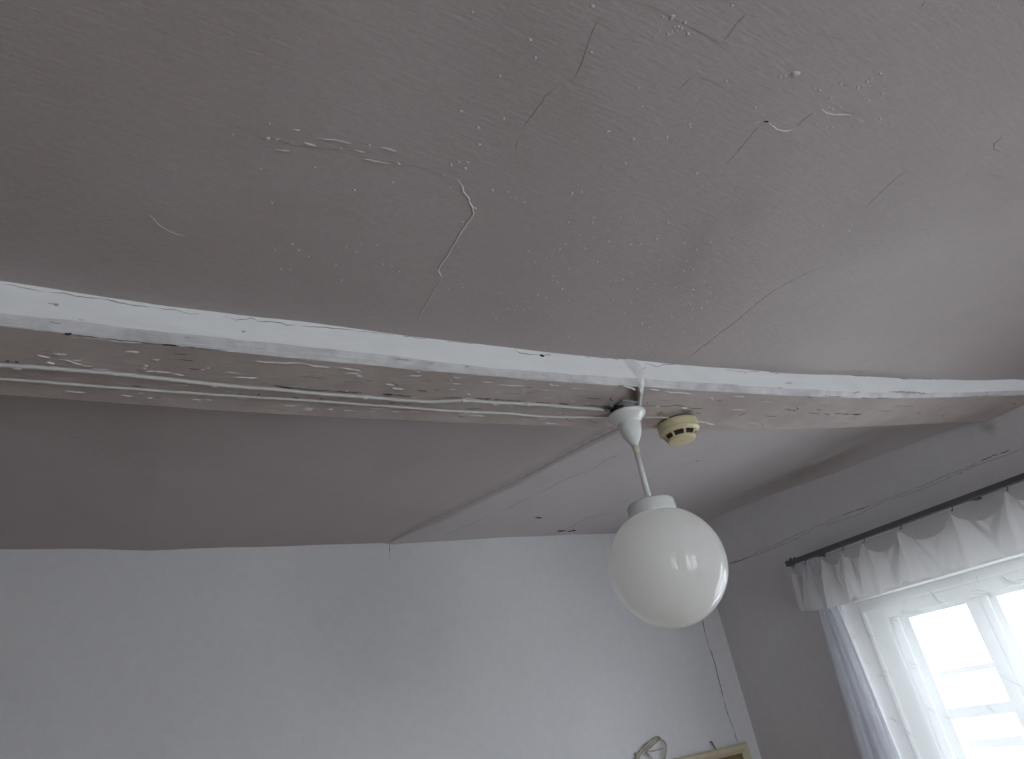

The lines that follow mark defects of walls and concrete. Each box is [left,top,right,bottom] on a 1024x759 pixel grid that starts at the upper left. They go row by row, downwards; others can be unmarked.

crack [725,109,864,165]
crack [225,122,477,344]
peeling [29,337,209,399]
crack [728,448,1023,564]
crack [702,620,737,740]